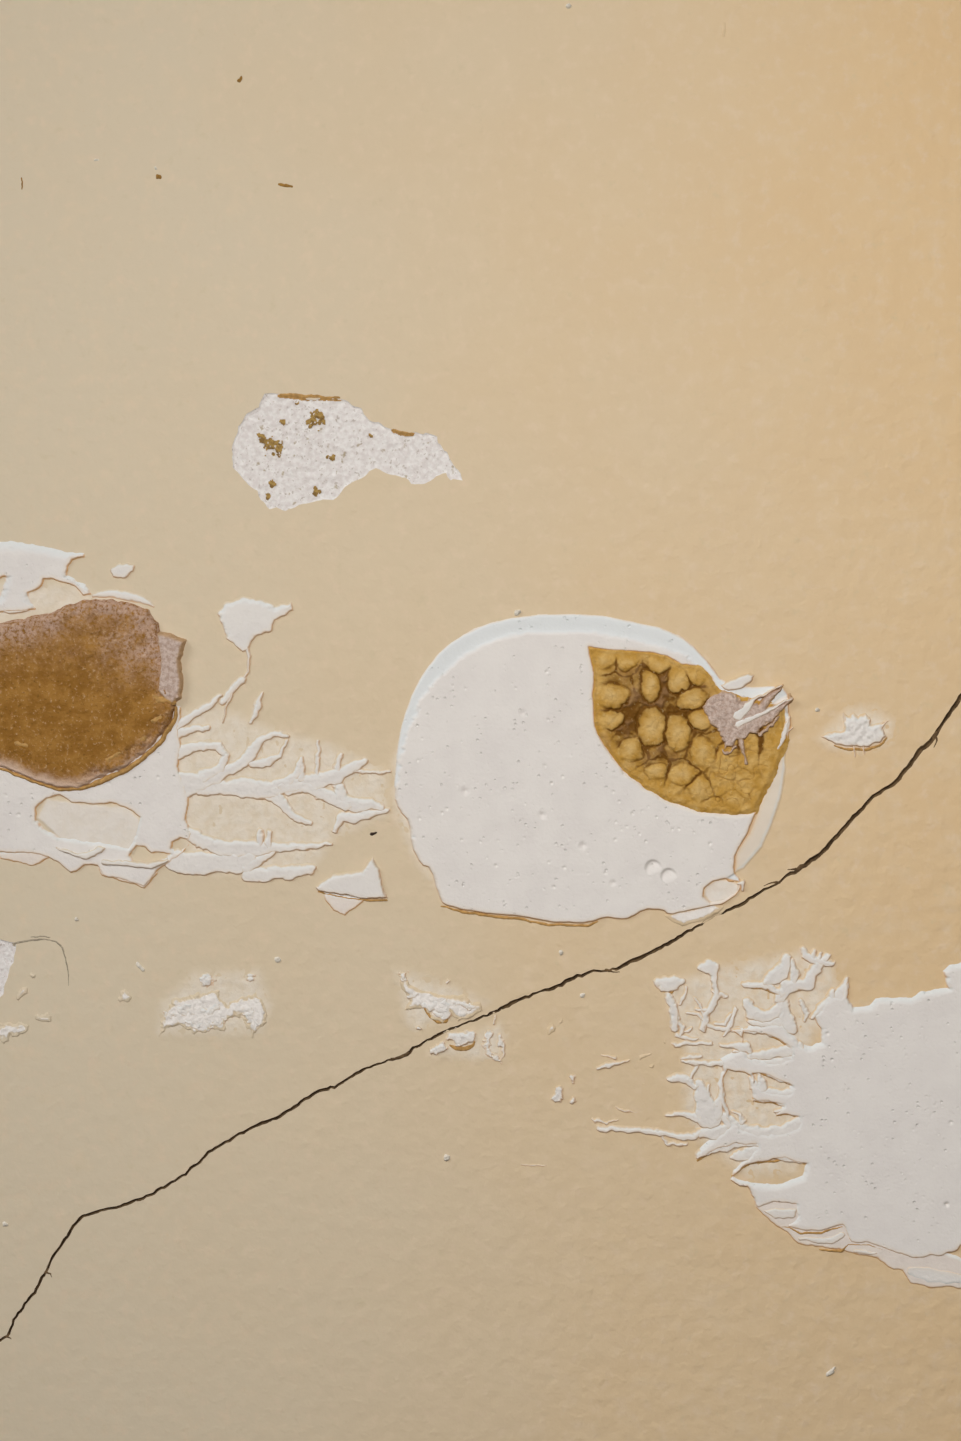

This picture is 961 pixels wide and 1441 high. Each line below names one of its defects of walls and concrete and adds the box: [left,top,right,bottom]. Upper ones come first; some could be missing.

peeling [232,393,463,511]
peeling [0,541,901,927]
peeling [0,939,16,997]
crack [0,693,961,1342]
peeling [596,944,961,1289]